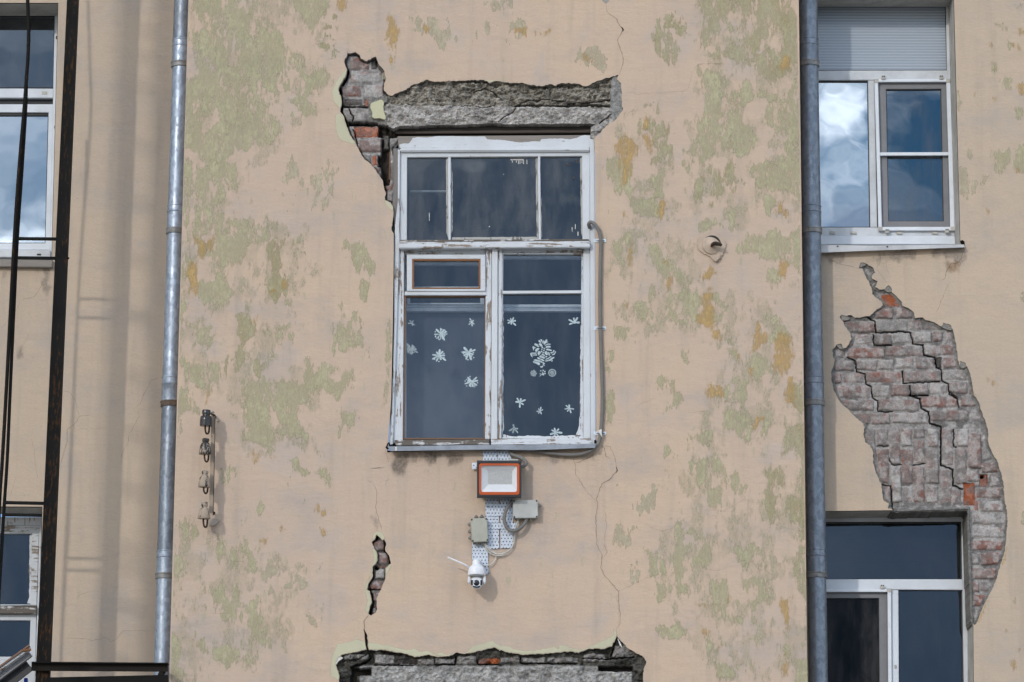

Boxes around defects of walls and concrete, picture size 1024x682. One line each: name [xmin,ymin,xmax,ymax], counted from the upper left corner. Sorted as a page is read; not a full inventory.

peeling [575,46,607,73]
peeling [606,0,800,232]
peeling [605,225,806,646]
spalling [831,263,1007,631]
spalling [365,532,392,615]
crack [363,615,371,657]
peeling [466,630,631,655]
peeling [779,626,808,682]